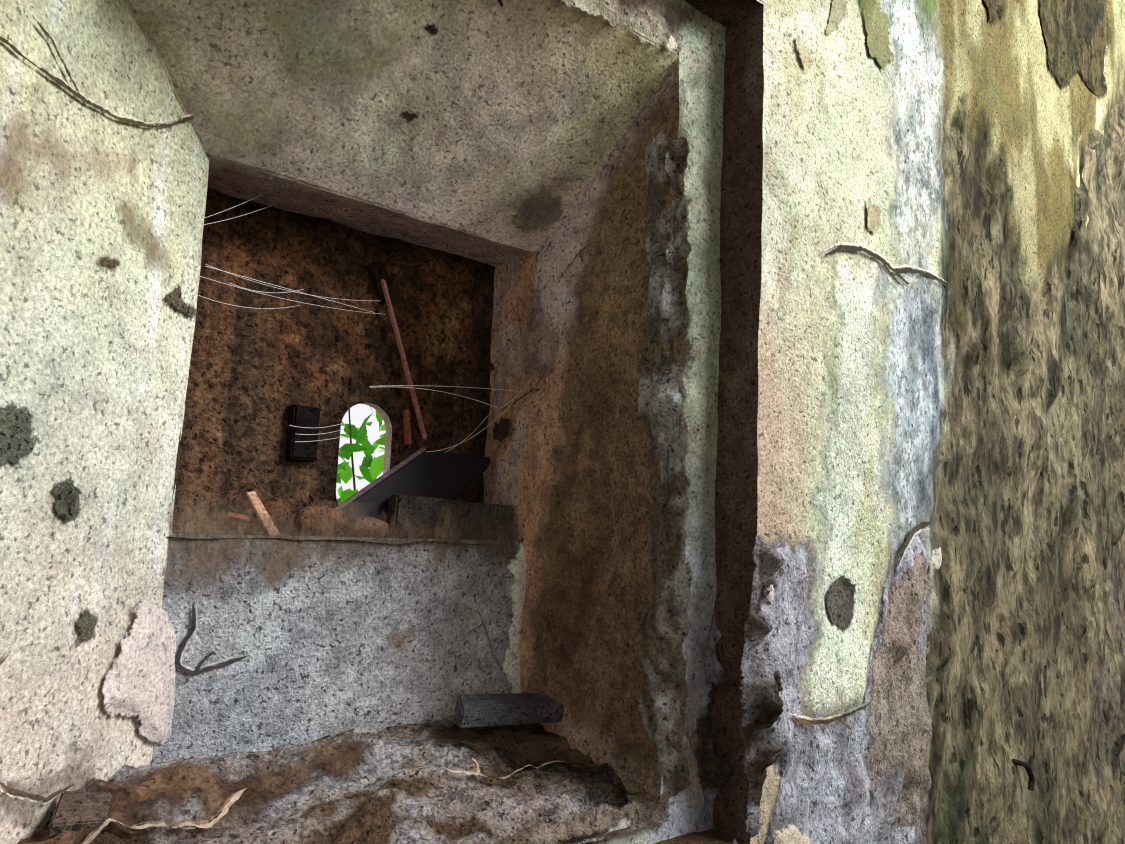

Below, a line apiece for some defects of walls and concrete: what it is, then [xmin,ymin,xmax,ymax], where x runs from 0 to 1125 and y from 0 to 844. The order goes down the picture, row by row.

spalling [562,0,682,52]
peeling [861,0,894,70]
crack [0,16,194,129]
spalling [99,255,120,270]
crack [824,242,947,286]
flaking render [165,281,198,319]
peeling [0,401,37,466]
peeling [53,476,82,522]
spalling [462,130,694,844]
flaking render [761,88,1125,844]
peeling [76,608,98,646]
spalling [2,745,112,837]